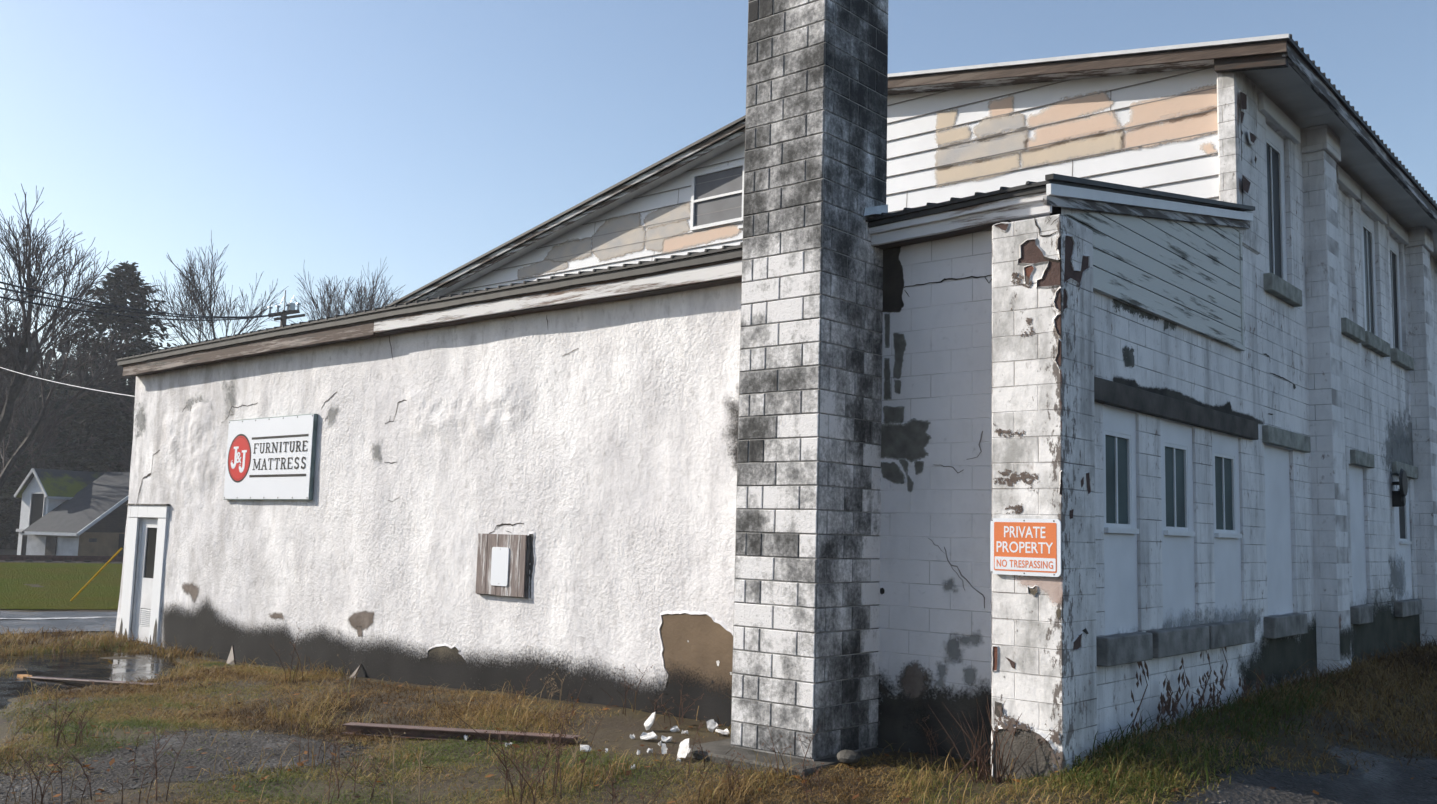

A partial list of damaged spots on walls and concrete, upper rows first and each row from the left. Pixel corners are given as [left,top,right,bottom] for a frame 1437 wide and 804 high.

spalling [993,222,1010,233]
crack [904,275,992,296]
spalling [1010,234,1090,381]
peeling [880,247,931,492]
mould [727,401,739,466]
crack [928,538,985,608]
leakage [160,599,732,727]
flaking render [658,610,733,695]
leakage [877,634,992,764]
spalling [991,701,1057,779]